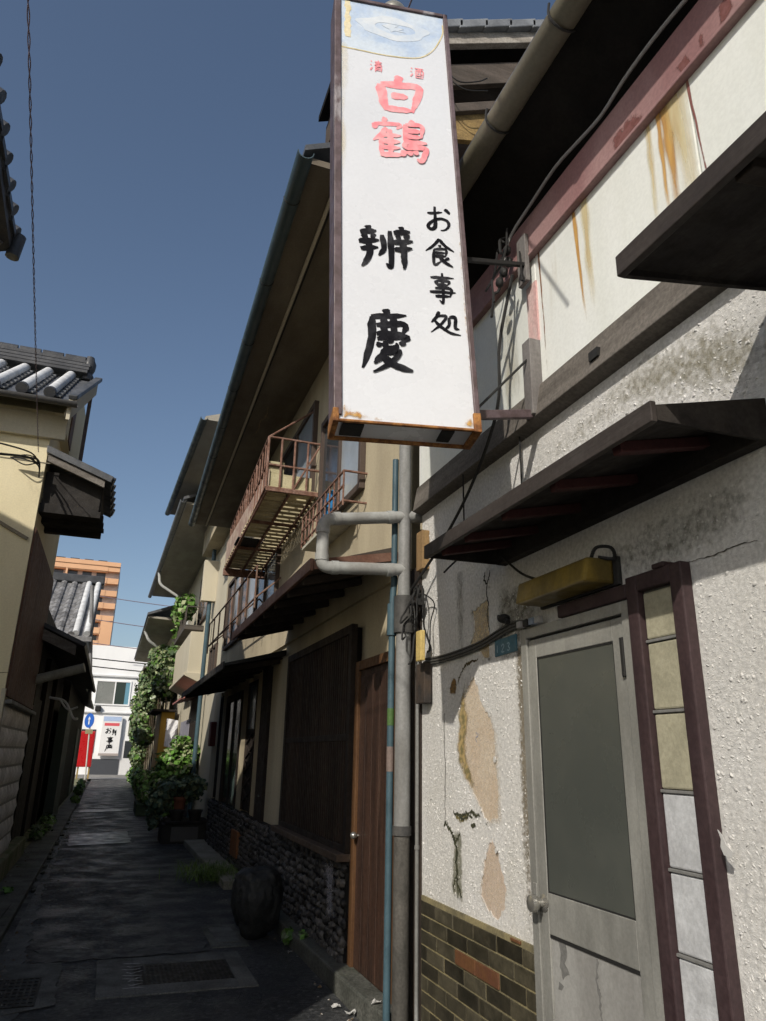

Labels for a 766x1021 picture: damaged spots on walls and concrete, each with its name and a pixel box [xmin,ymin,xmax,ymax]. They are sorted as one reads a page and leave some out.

corrosion [646,80,707,193]
corrosion [572,199,590,295]
crack [689,540,757,562]
peeling [470,601,491,661]
peeling [458,676,498,829]
peeling [480,841,507,920]